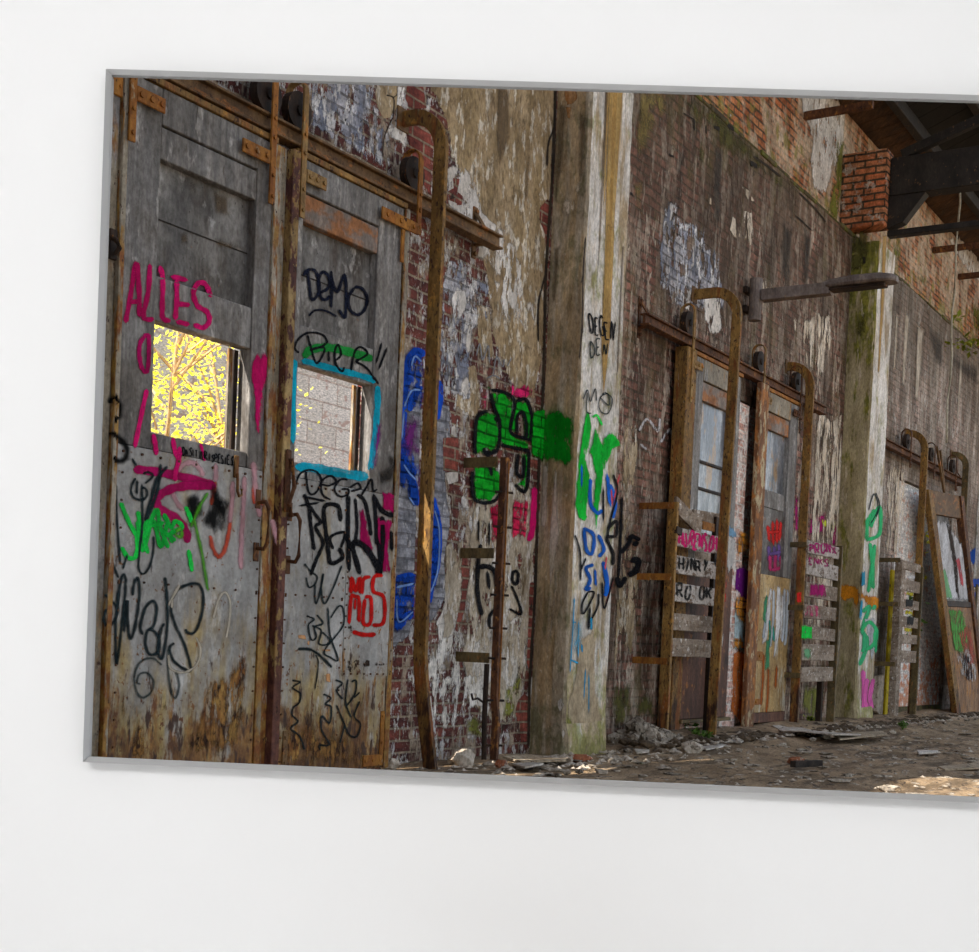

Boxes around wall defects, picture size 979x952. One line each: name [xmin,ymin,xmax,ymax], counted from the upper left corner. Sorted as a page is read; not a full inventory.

spalling [730,187,754,244]
peeling [659,202,724,333]
peeling [311,83,577,743]
rust [133,726,144,756]
rust [190,656,246,751]
rust [279,721,374,767]